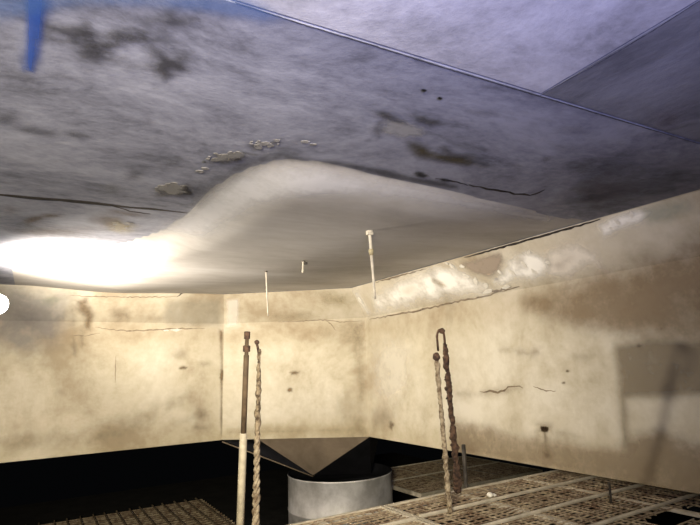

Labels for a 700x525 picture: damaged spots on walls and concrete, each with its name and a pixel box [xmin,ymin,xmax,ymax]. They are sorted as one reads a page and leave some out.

damp [75,33,146,58]
damp [155,54,184,77]
crack [435,178,544,196]
crack [0,194,187,214]
peeling [375,245,599,308]
crack [279,285,519,328]
crack [73,327,205,336]
crack [480,385,555,394]